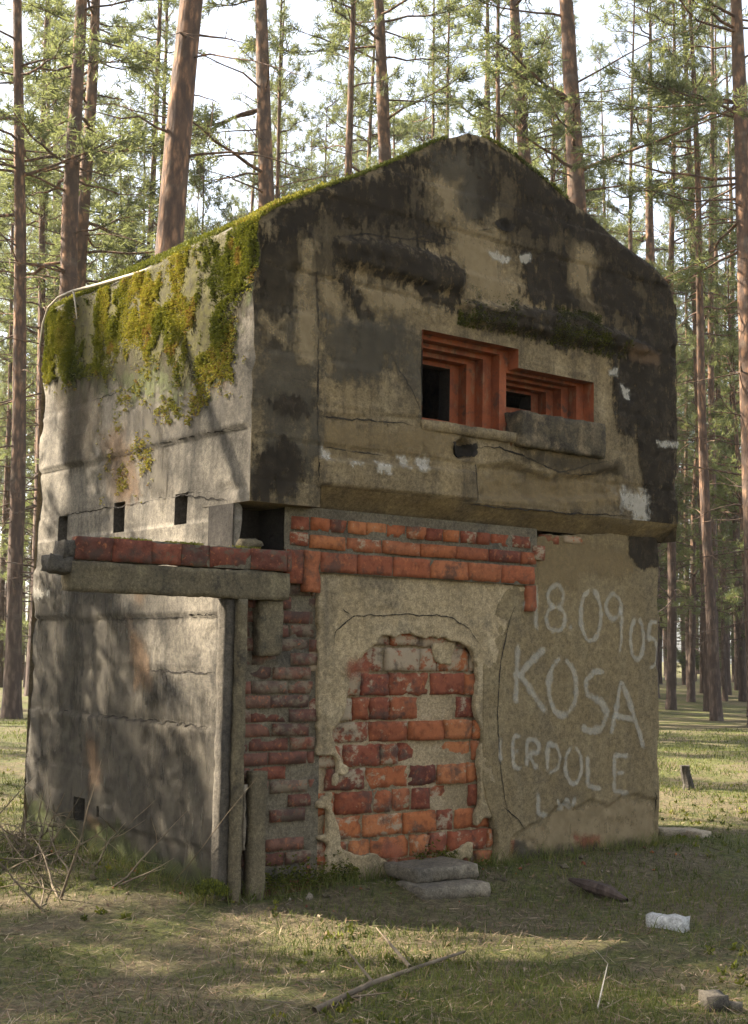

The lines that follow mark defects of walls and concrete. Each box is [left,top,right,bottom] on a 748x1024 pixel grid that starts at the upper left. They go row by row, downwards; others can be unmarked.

leakage [53,133,678,524]
crack [465,446,633,516]
crack [64,488,230,516]
leakage [629,536,659,570]
peeling [431,641,455,665]
crack [144,667,215,675]
crack [62,710,203,728]
crack [332,600,525,829]
peeling [518,796,655,854]